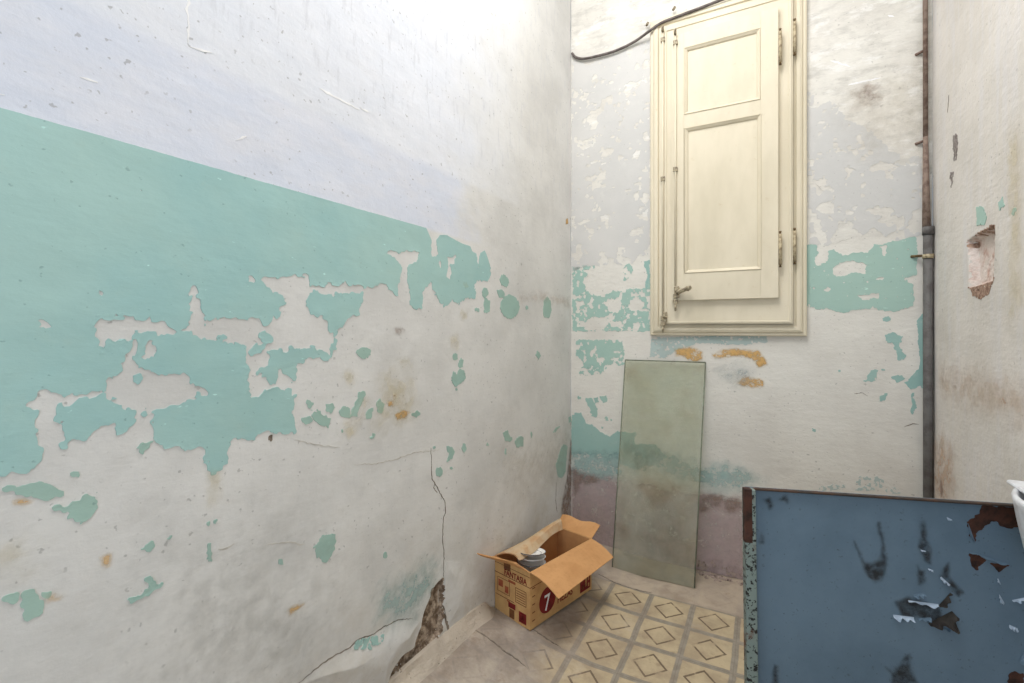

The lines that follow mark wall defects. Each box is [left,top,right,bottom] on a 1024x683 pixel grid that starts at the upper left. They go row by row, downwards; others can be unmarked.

peeling [571,40,768,375]
peeling [807,92,923,414]
spalling [966,206,996,299]
peeling [0,108,528,524]
rust [676,348,766,366]
rust [740,377,763,387]
peeling [313,534,336,563]
crack [298,440,446,577]
leakage [562,444,749,580]
peeling [1,589,52,622]
crack [299,618,412,683]
spalling [390,578,445,678]